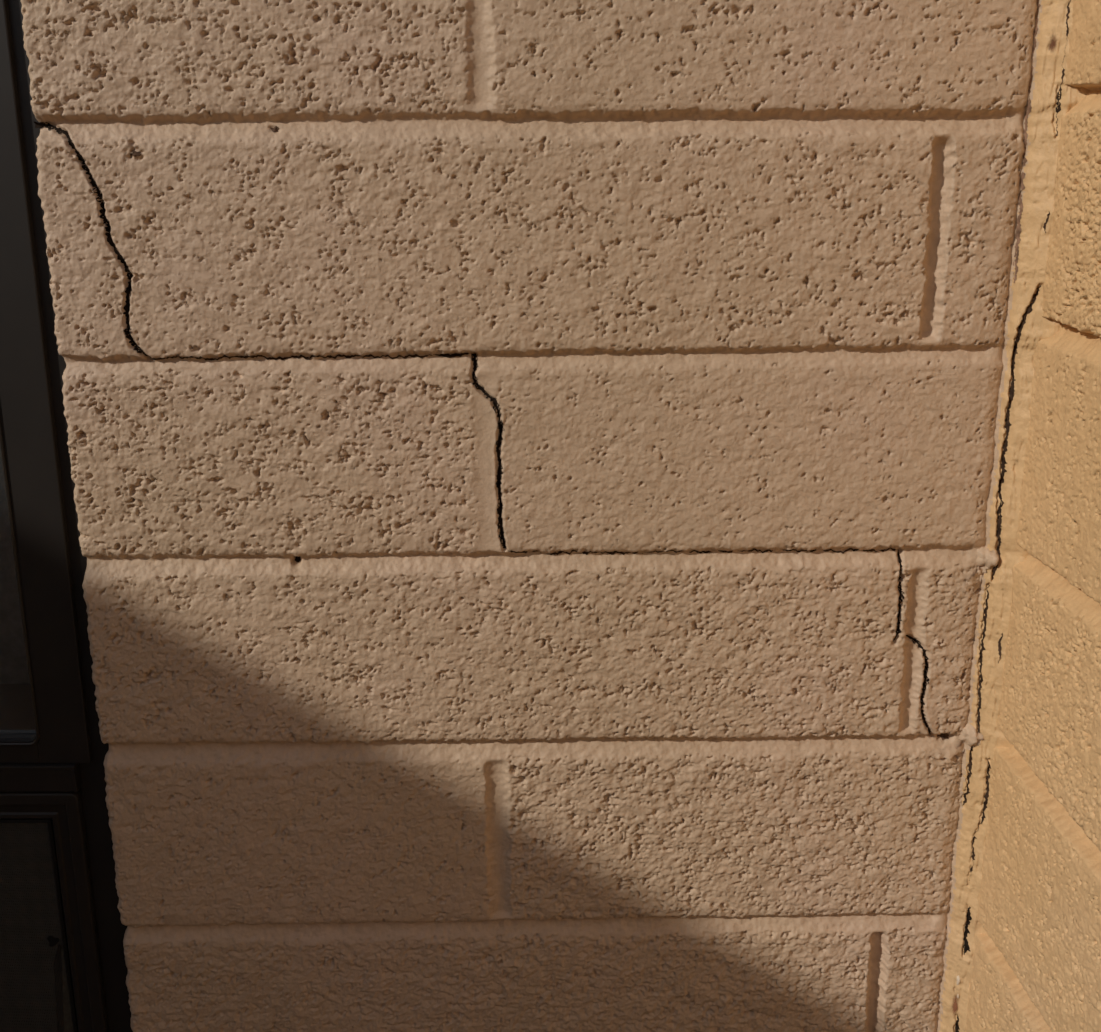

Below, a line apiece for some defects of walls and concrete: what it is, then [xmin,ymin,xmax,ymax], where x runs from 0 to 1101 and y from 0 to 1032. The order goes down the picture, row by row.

crack [34,122,931,734]
crack [963,0,1071,955]